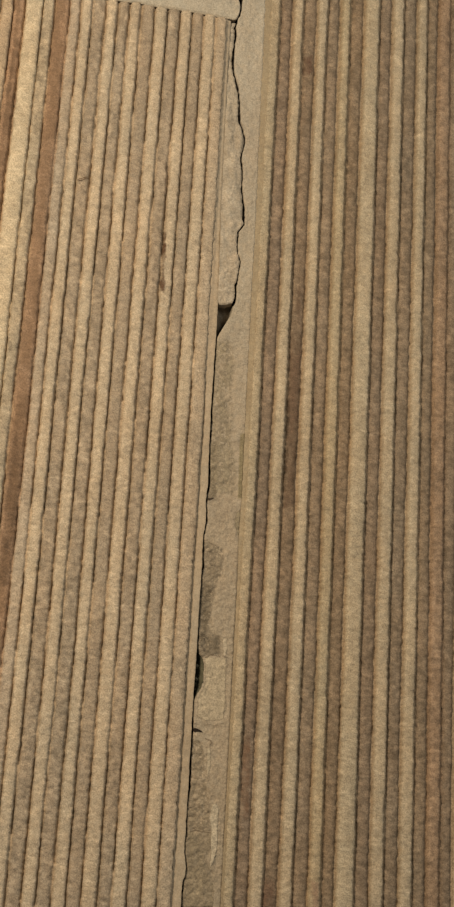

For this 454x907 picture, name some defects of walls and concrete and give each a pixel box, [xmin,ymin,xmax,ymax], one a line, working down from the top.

crack [155,0,245,306]
crack [197,339,228,658]
crack [181,699,212,904]